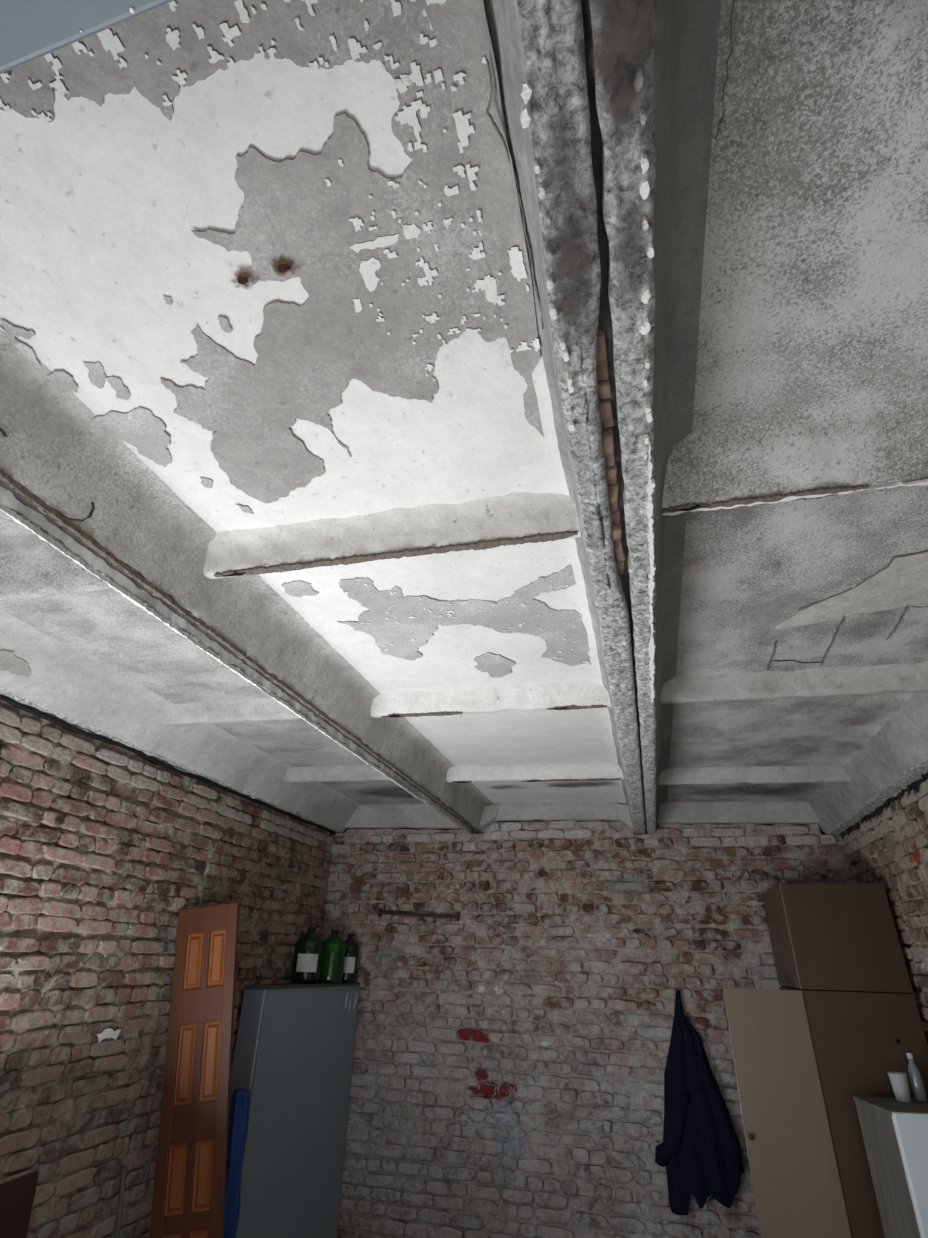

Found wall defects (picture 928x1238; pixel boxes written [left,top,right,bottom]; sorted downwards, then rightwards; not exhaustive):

water stain [590,0,662,146]
crack [715,0,735,140]
corrosion [232,272,258,288]
peeling [0,0,557,514]
corrosion [272,257,294,275]
water stain [545,131,591,347]
water stain [614,191,642,304]
peeling [559,338,575,432]
peeling [214,531,591,666]
peeling [474,653,516,678]
crack [767,550,928,671]